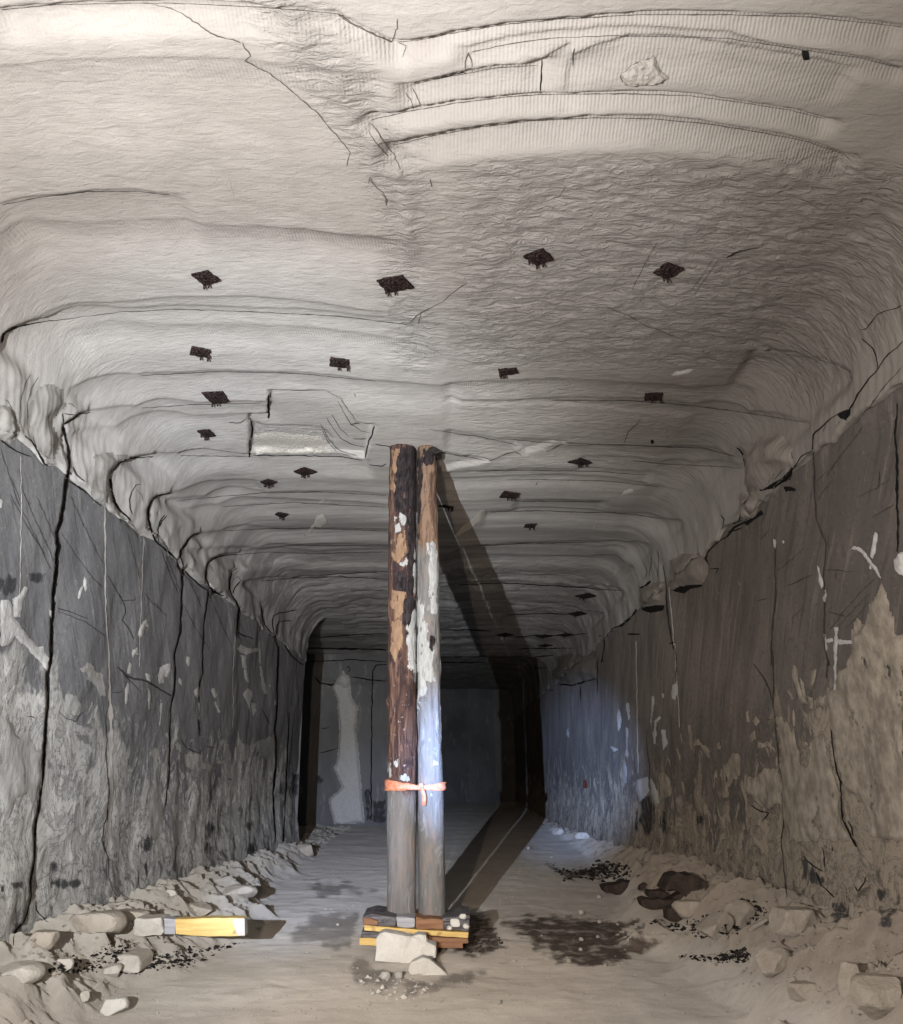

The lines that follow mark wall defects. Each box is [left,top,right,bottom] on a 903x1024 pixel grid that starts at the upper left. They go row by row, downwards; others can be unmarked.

crack [157,5,351,164]
spalling [253,432,331,455]
crack [705,516,752,573]
crack [752,305,902,779]
crack [1,412,387,946]
crack [751,708,866,898]